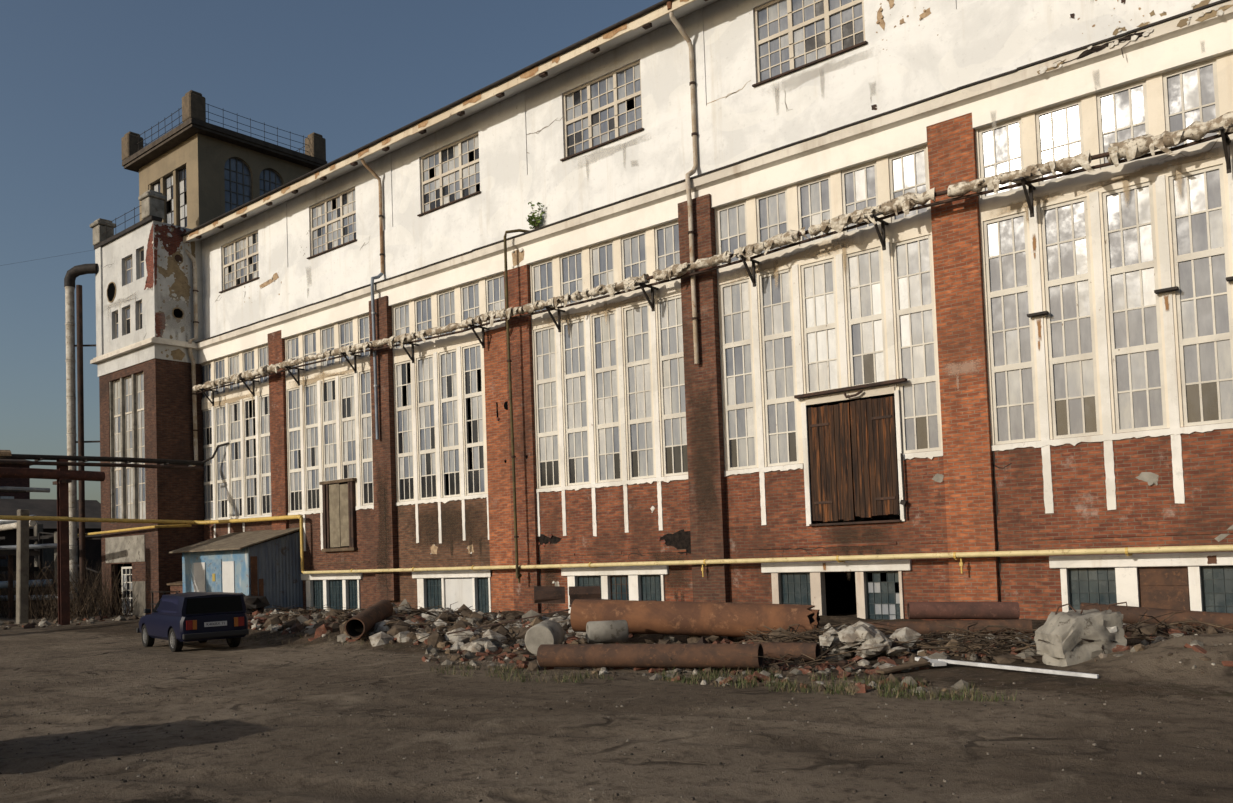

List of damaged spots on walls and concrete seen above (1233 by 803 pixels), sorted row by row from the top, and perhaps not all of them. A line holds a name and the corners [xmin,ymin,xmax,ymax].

peeling [876,0,931,50]
flaking render [1037,0,1233,74]
flaking render [144,224,196,361]